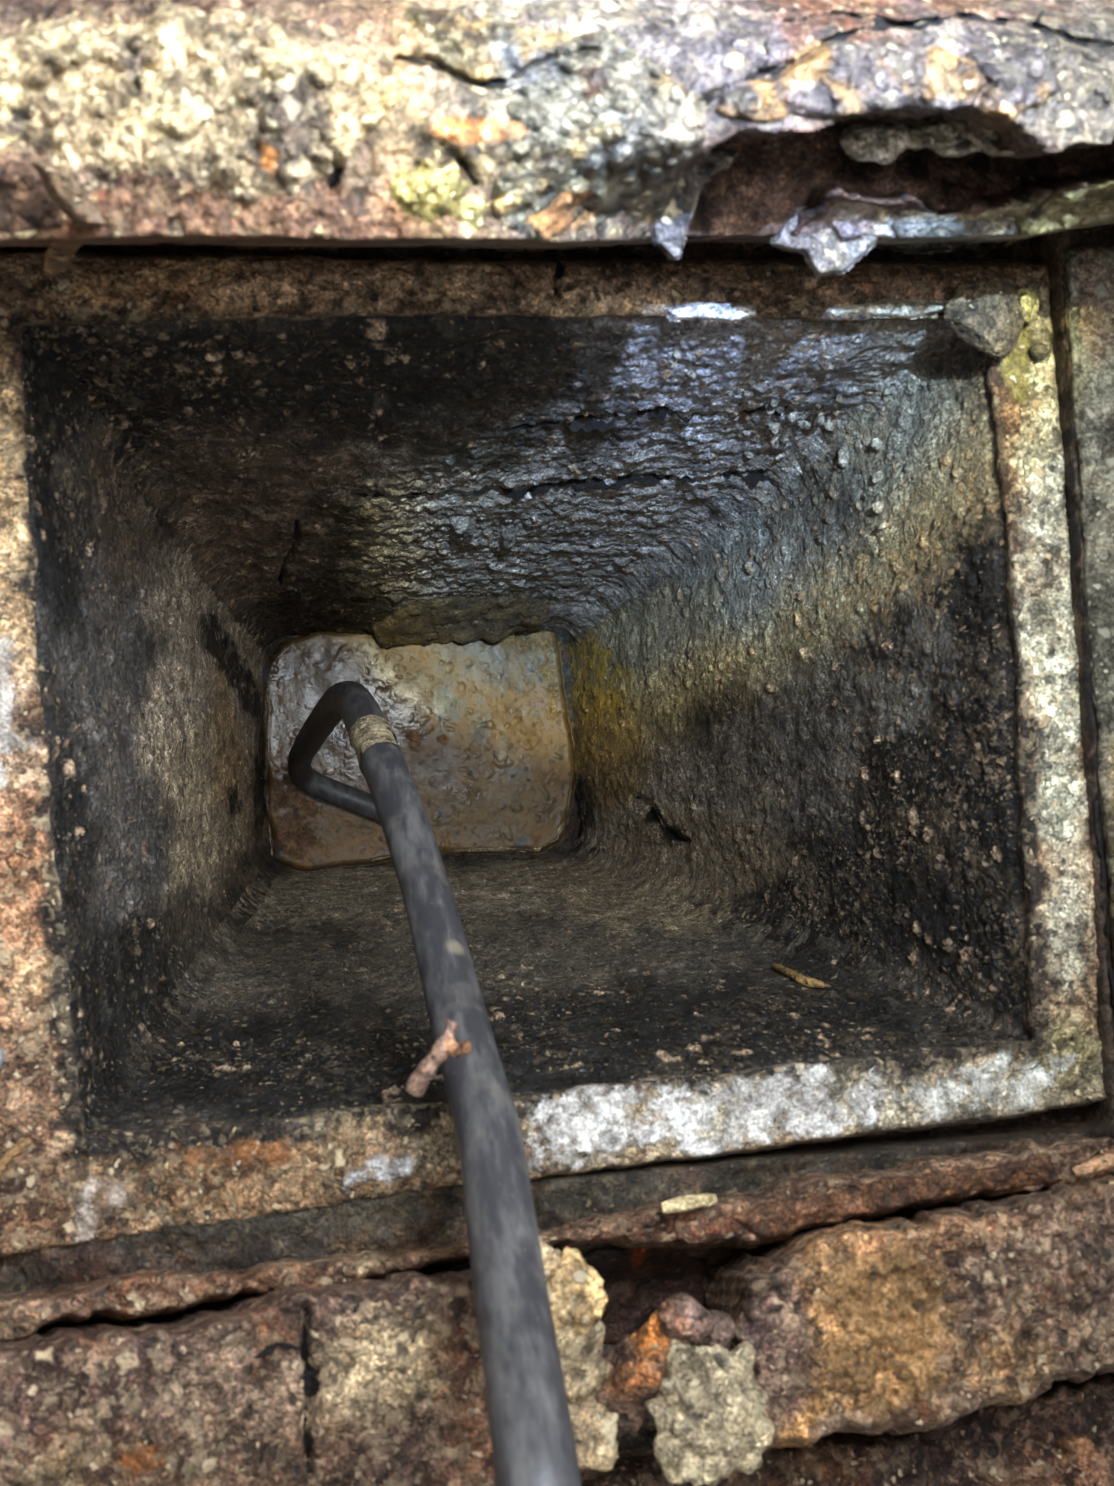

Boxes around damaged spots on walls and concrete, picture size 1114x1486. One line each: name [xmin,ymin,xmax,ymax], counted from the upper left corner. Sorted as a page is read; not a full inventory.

crack [397,54,527,97]
crack [702,10,1114,106]
crack [440,144,479,187]
spalling [627,115,1114,278]
spalling [581,1247,712,1345]
crack [254,1307,321,1474]
corrosion [595,1292,736,1444]